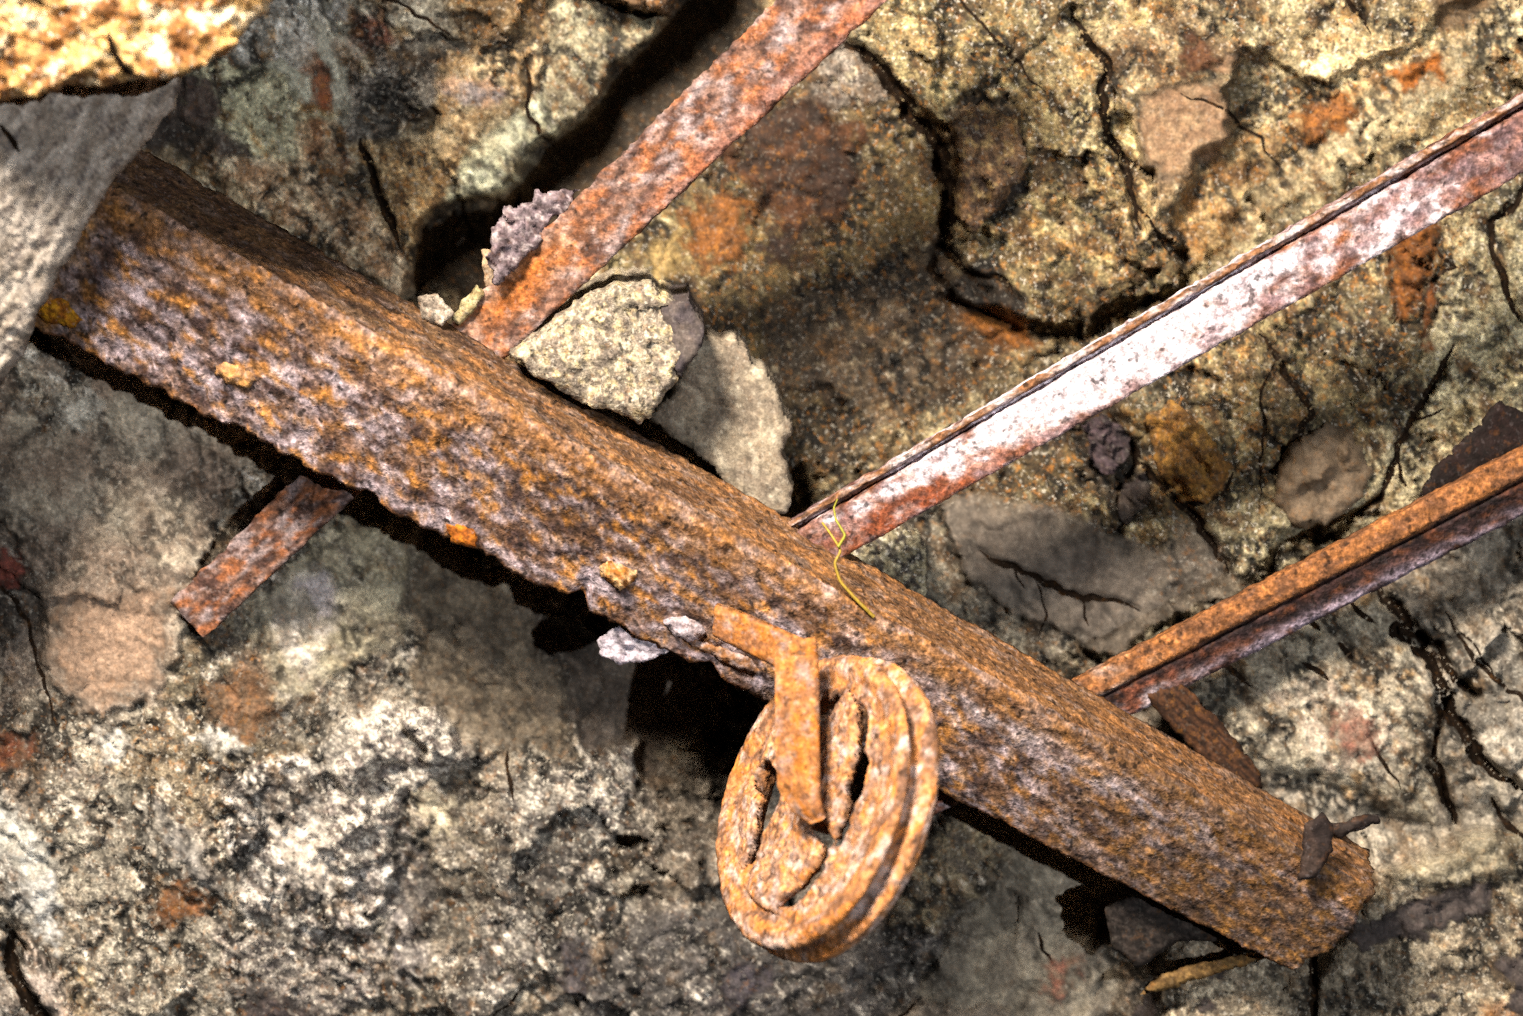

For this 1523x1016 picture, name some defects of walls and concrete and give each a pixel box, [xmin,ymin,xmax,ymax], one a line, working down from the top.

corrosion [1289,91,1359,144]
corrosion [1388,53,1444,92]
crack [843,41,1022,328]
corrosion [485,189,579,286]
corrosion [638,185,758,281]
corrosion [965,306,1033,347]
corrosion [1385,224,1440,352]
corrosion [597,625,669,666]
corrosion [688,639,762,676]
crack [1303,588,1523,838]
corrosion [157,882,215,927]
crack [0,921,50,1016]